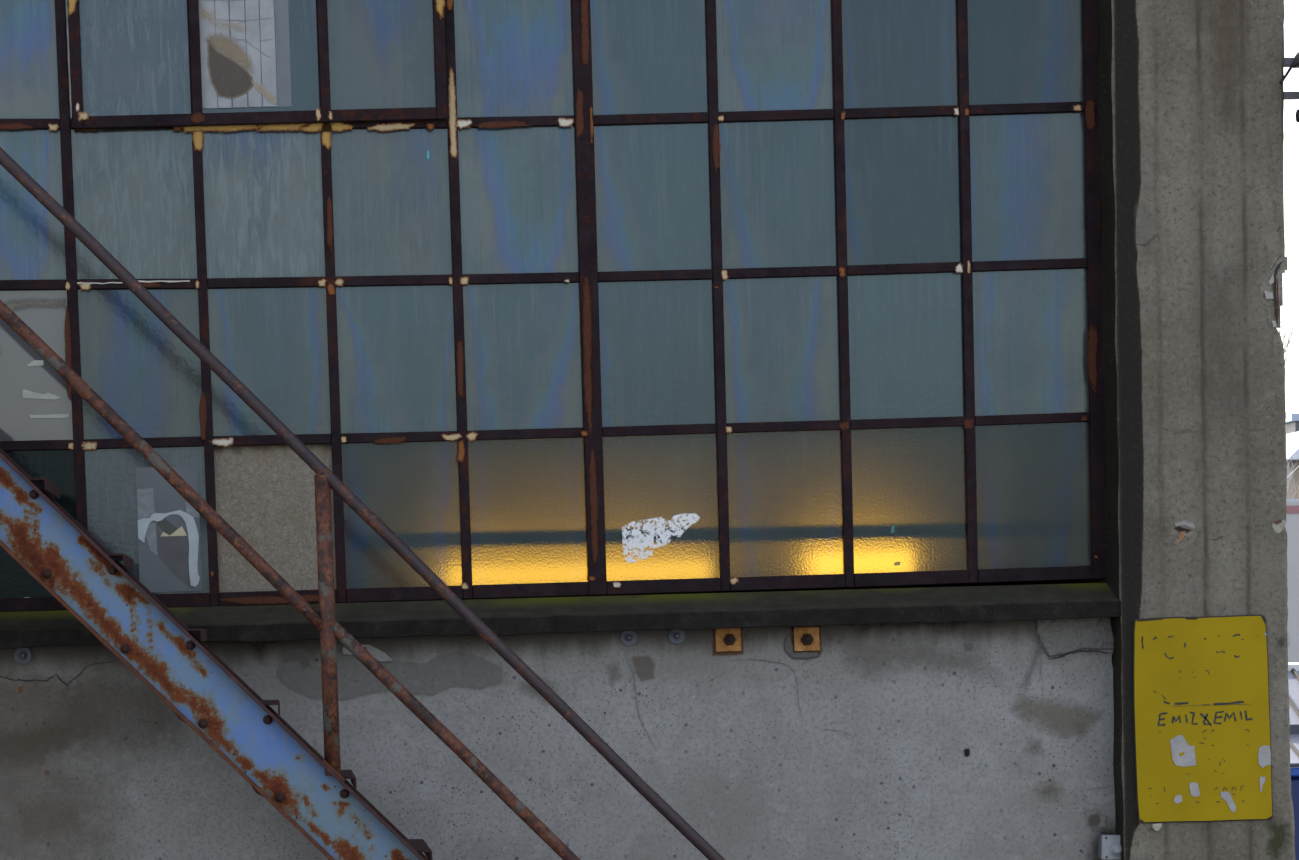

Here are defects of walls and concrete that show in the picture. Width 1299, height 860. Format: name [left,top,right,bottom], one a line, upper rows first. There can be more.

peeling [67,0,77,16]
corrosion [580,0,590,65]
peeling [182,108,415,152]
corrosion [478,120,532,129]
corrosion [576,87,594,144]
corrosion [712,124,720,173]
corrosion [326,195,334,253]
spalling [1261,257,1288,328]
corrosion [64,307,72,400]
corrosion [581,276,599,565]
spalling [1170,520,1197,549]
crack [0,659,120,688]